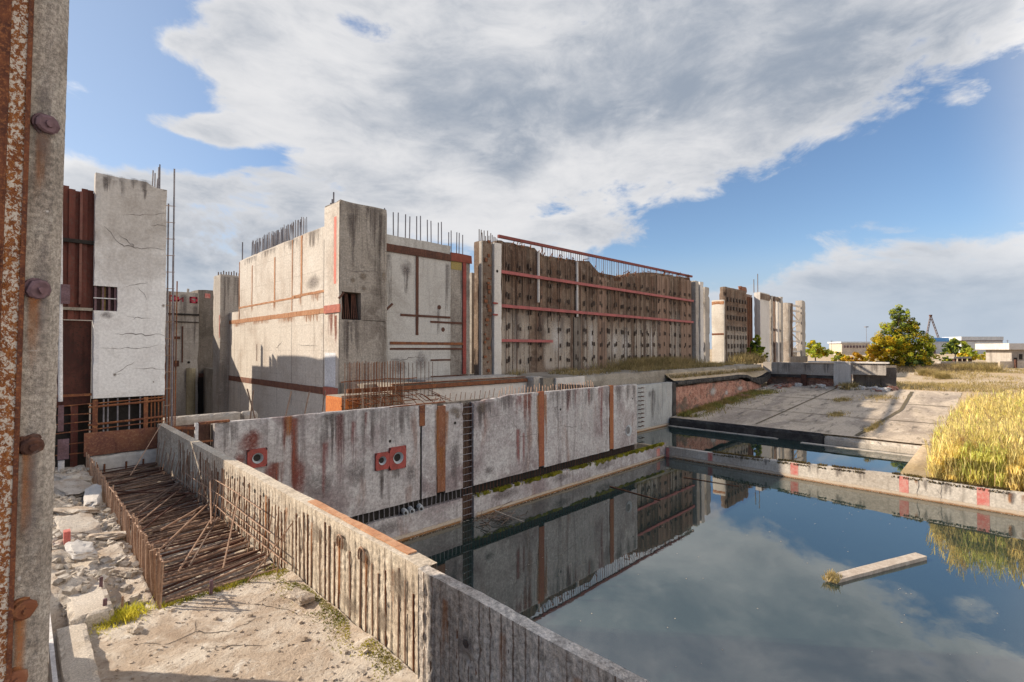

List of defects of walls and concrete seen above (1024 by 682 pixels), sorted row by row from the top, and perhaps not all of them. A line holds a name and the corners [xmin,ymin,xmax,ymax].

crack [103,213,164,250]
crack [109,283,164,375]
rust [266,416,305,490]
rust [518,394,547,441]